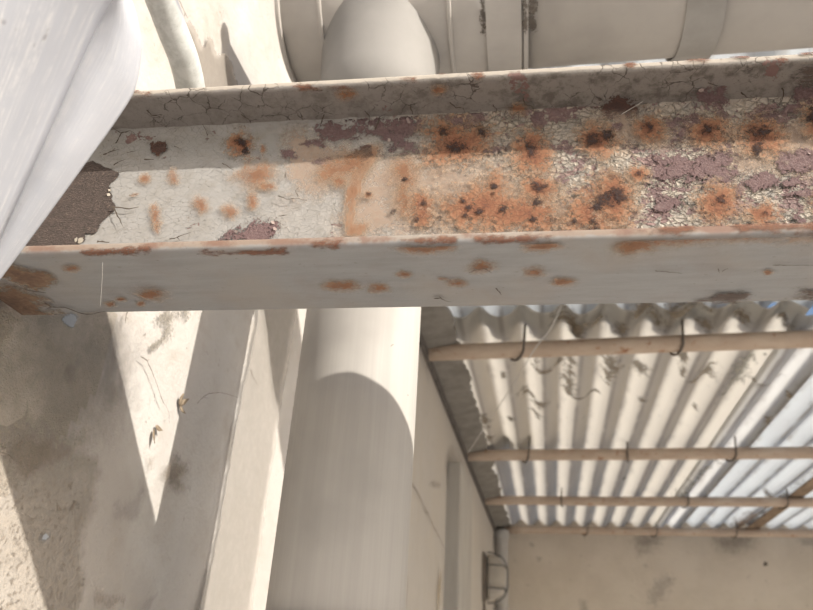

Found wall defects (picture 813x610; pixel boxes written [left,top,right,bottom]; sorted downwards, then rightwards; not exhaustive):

rust [150,141,167,157]
rust [222,126,275,209]
rust [282,95,813,254]
peeling [642,84,813,213]
peeling [26,161,119,246]
rust [79,246,151,256]
rust [203,248,288,256]
rust [0,266,64,315]
rust [322,280,359,291]
water stain [150,311,191,351]